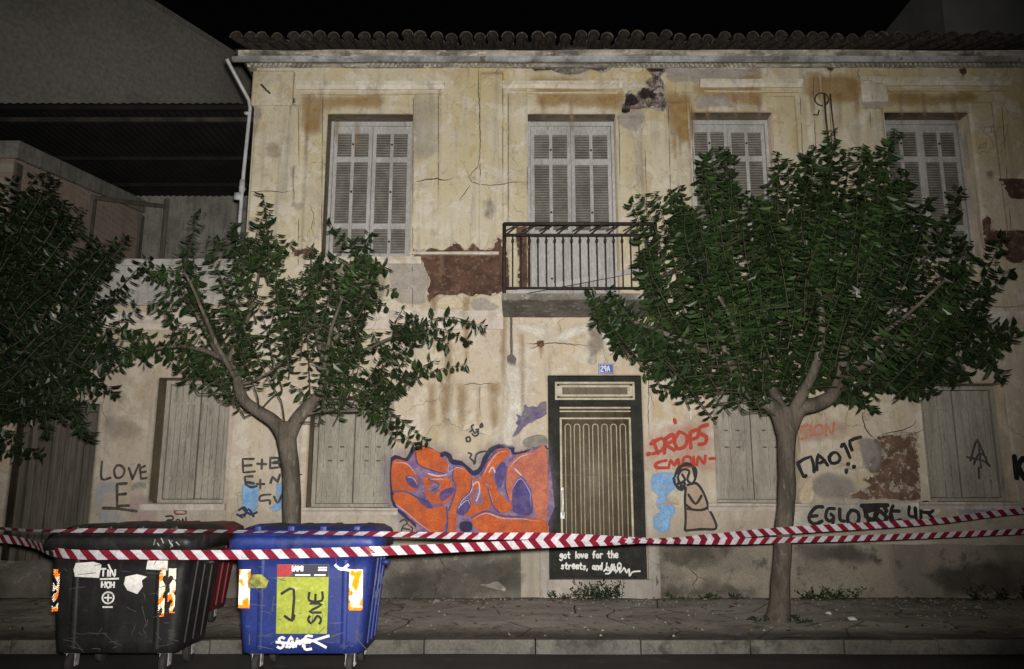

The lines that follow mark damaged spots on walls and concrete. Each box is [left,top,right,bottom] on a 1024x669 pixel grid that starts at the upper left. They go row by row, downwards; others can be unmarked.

spalling [620,68,669,113]
crack [416,70,524,199]
leakage [668,94,691,145]
spalling [999,177,1024,201]
spalling [412,225,531,304]
spalling [982,215,1024,266]
spalling [793,432,941,526]